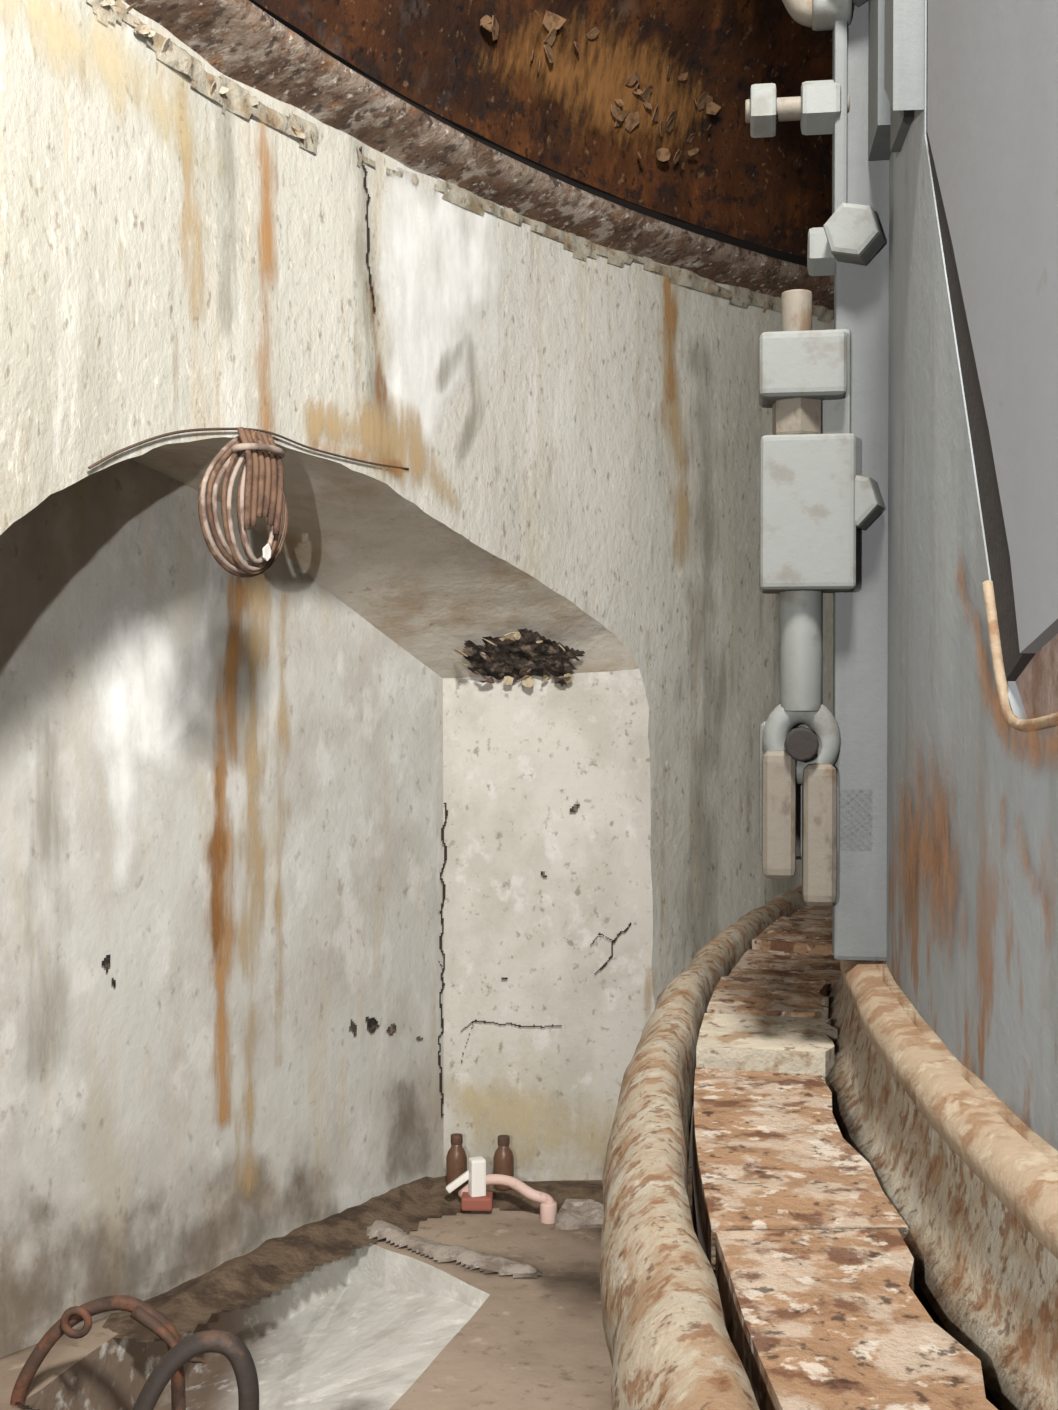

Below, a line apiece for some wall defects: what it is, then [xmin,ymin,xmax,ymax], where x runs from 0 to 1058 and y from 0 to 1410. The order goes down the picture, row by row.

spalling [87,0,319,154]
rust [260,137,273,275]
rust [664,278,686,466]
rust [279,696,287,737]
rust [975,620,1058,761]
rust [210,574,285,1129]